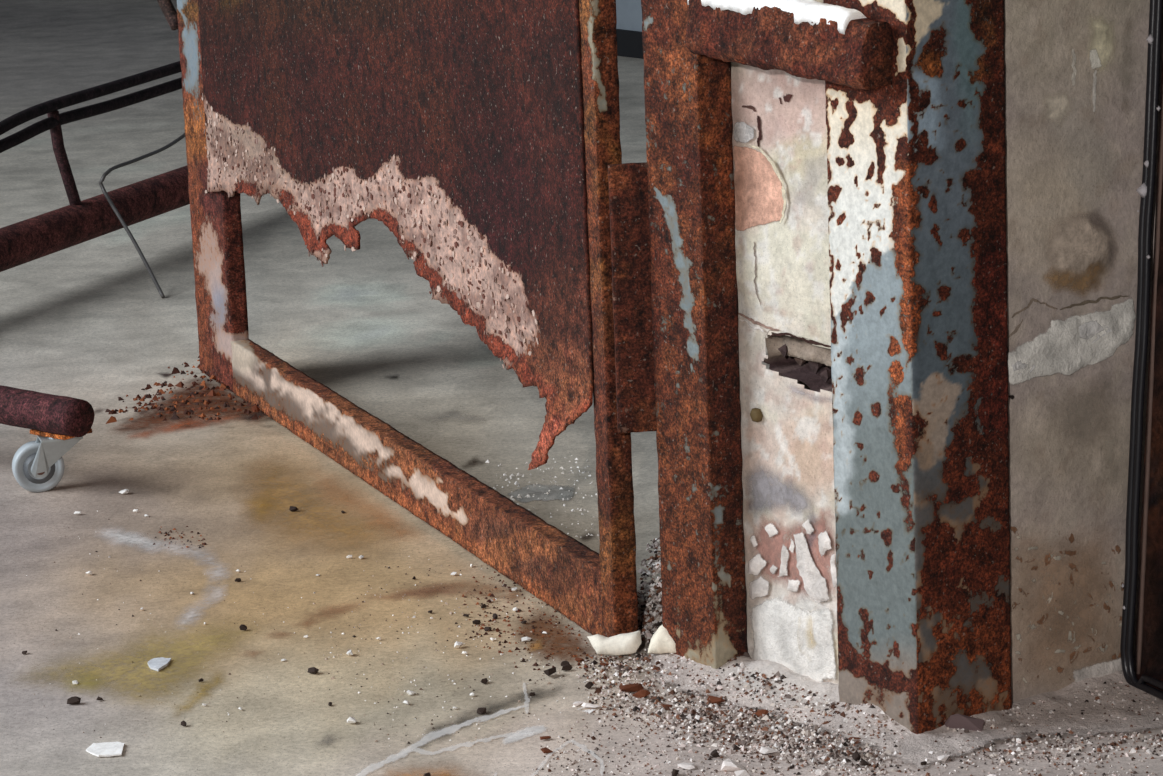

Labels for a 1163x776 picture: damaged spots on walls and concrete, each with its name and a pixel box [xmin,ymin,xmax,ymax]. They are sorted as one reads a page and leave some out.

corrosion [202,93,539,356]
crack [1008,295,1129,338]
spalling [763,330,832,400]
corrosion [124,382,267,430]
flaking render [748,514,837,605]
corrosion [521,616,589,660]